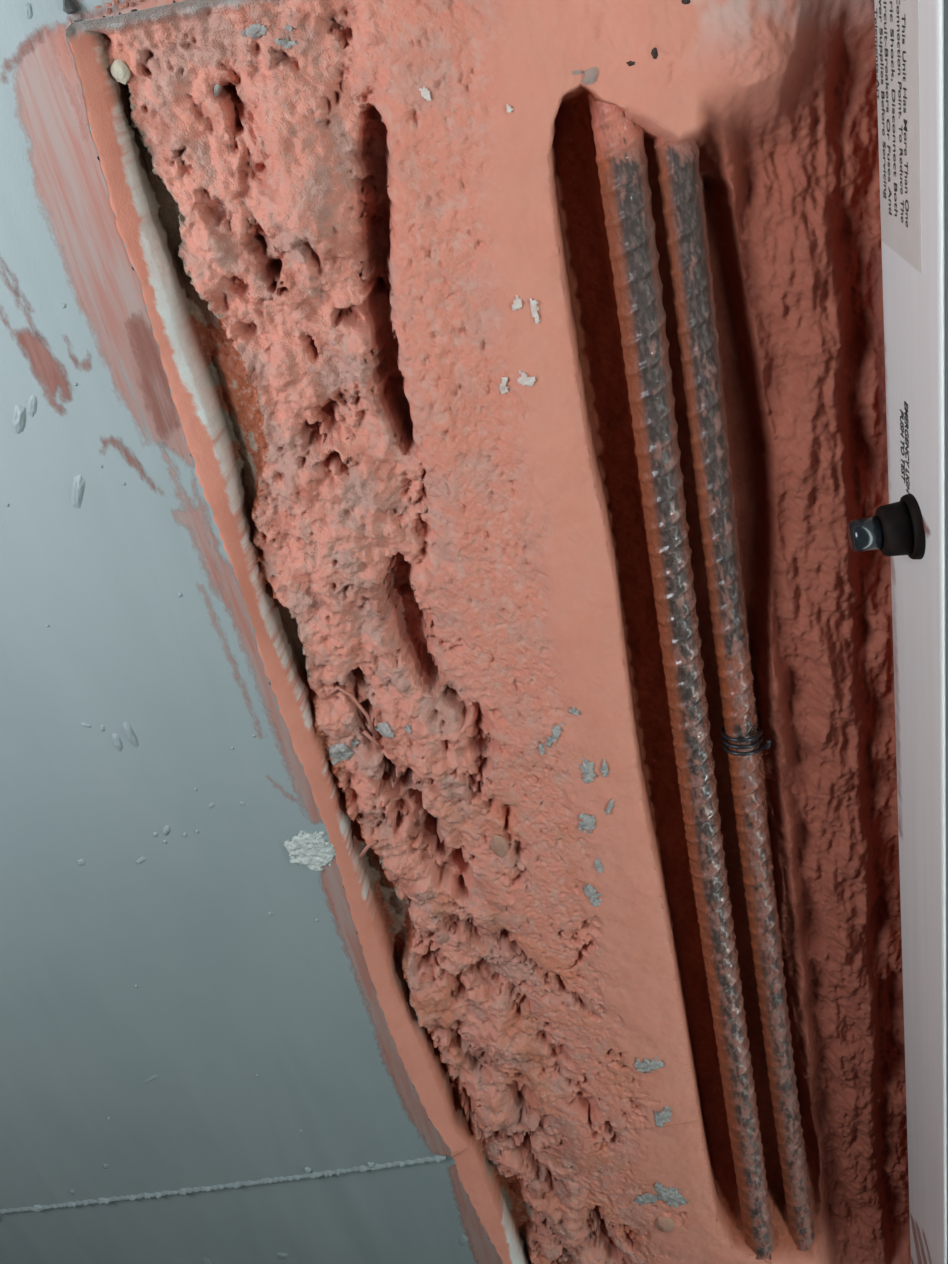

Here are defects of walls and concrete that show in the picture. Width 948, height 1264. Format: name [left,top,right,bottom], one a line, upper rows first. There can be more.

peeling [63,0,78,14]
spalling [66,0,669,1264]
spalling [477,0,911,1264]